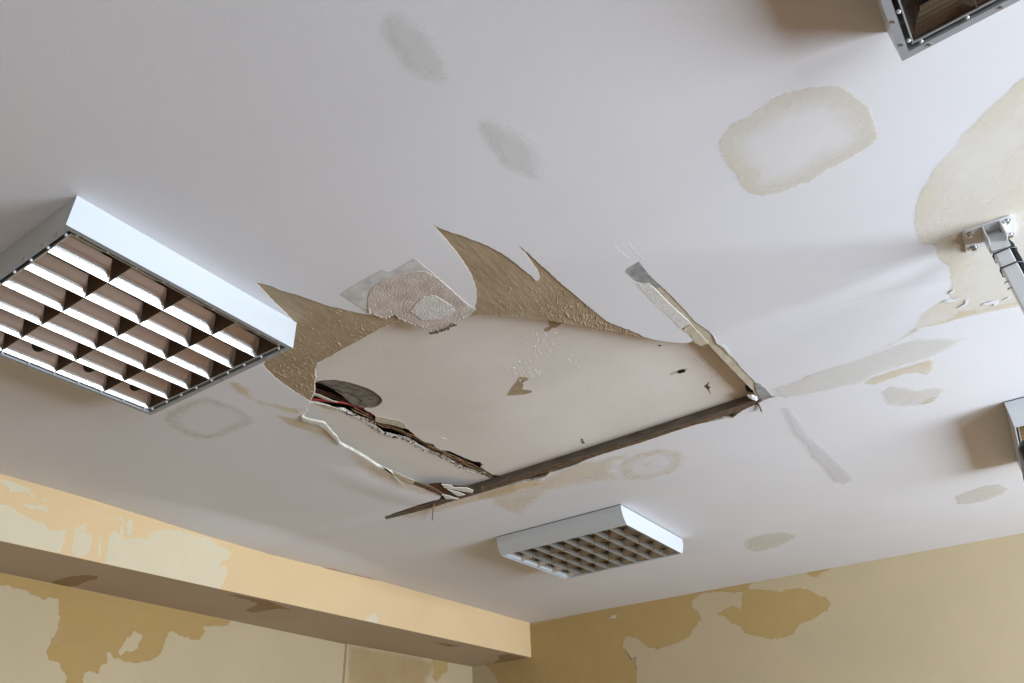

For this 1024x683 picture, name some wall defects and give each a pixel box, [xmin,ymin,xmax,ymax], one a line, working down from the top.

peeling [434,225,646,339]
peeling [257,283,401,400]
crack [311,380,498,478]
flaking render [442,484,473,499]